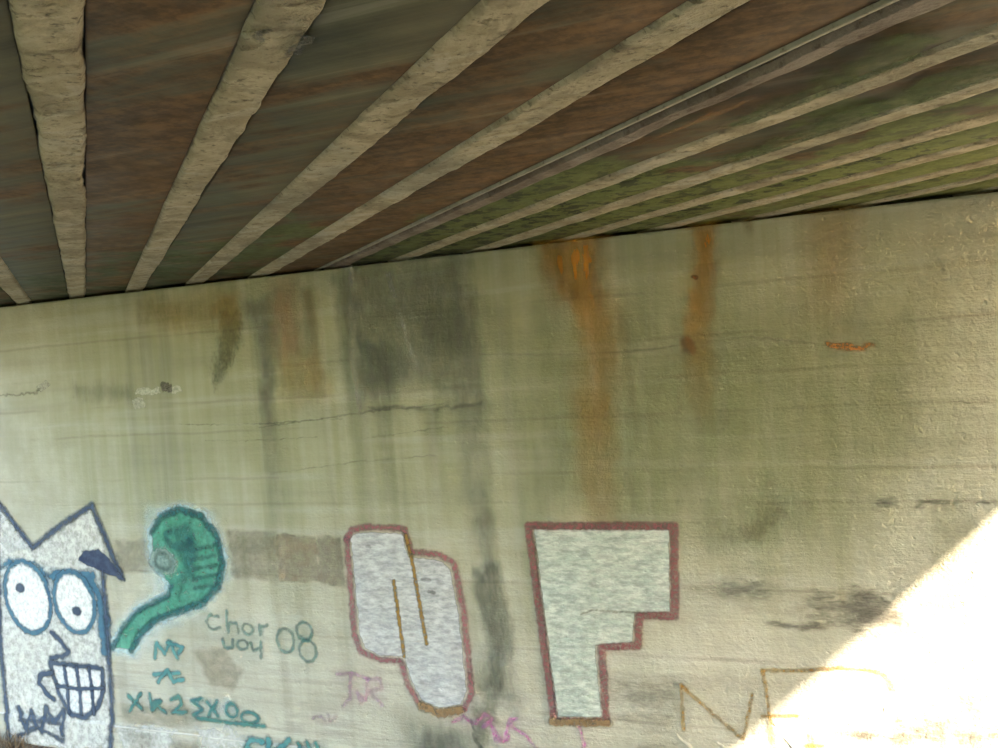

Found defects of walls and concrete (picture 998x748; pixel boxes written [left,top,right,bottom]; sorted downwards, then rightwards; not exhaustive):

corrosion [826,342,874,351]
damp [477,569,509,689]